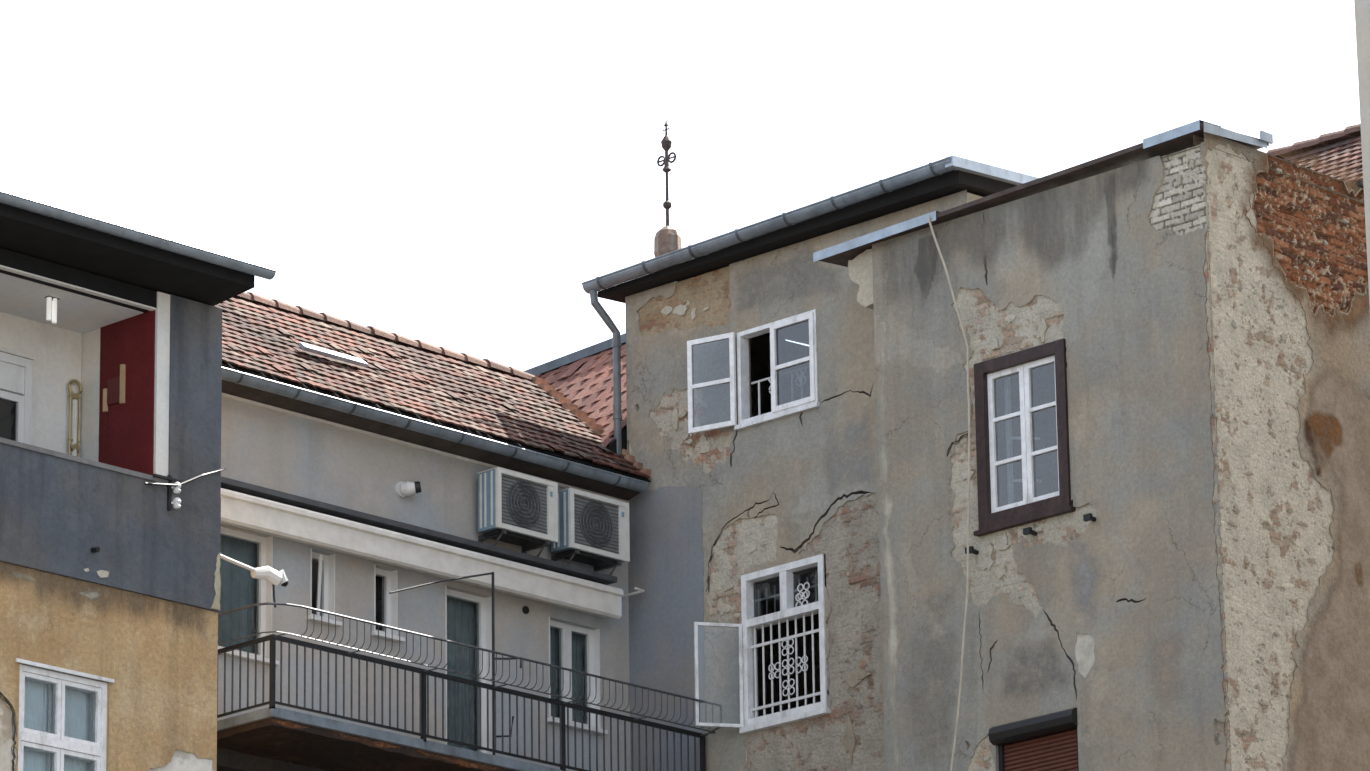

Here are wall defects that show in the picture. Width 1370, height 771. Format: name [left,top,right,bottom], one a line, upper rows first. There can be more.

spalling [636,266,731,338]
water stain [916,218,999,285]
water stain [1024,159,1141,261]
spalling [634,388,734,476]
spalling [949,286,1097,619]
spalling [1147,143,1368,771]
crack [708,491,779,592]
crack [780,490,871,553]
water stain [1290,369,1370,771]
spalling [743,494,885,771]
crack [1044,611,1077,699]
crack [0,692,16,771]